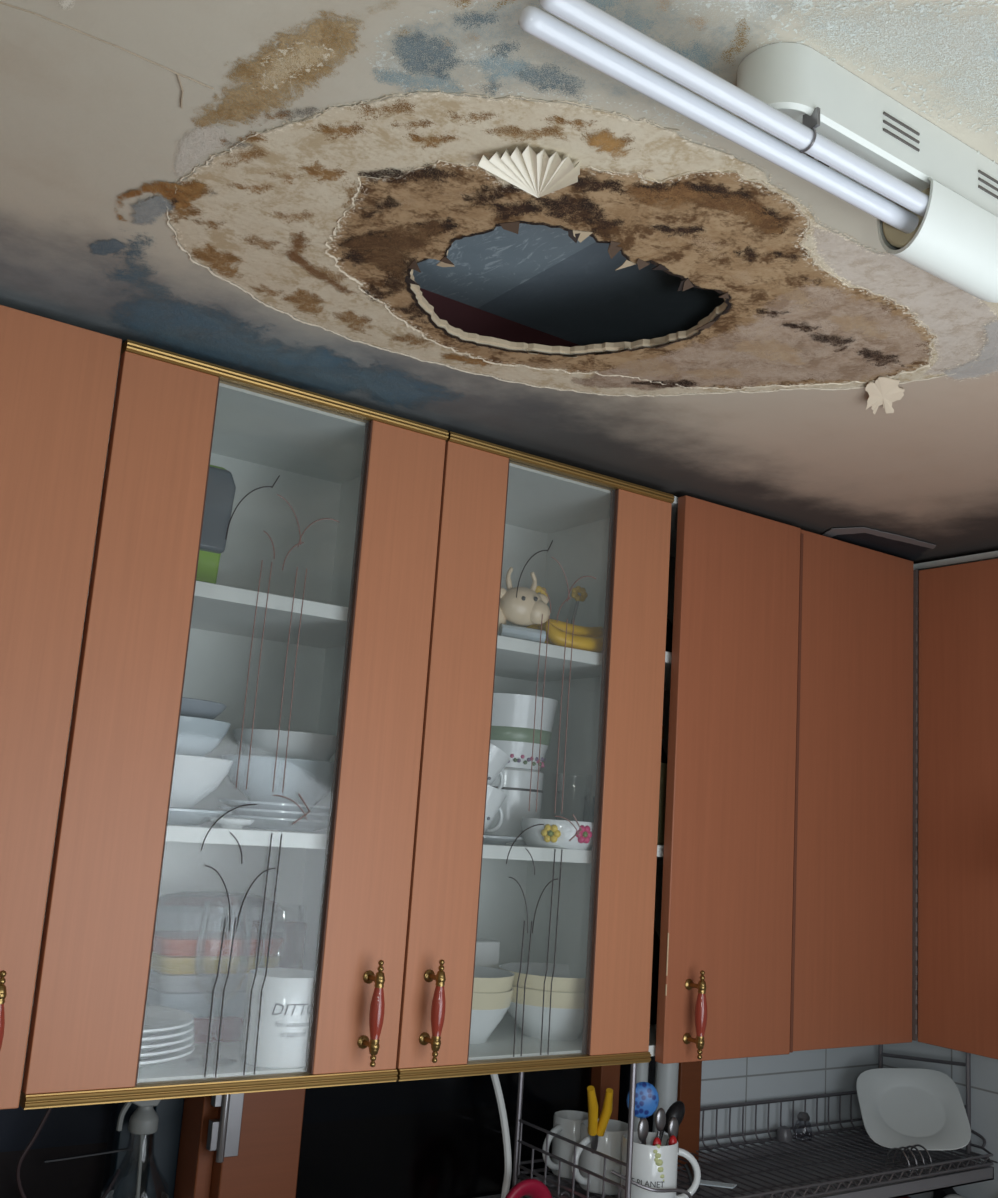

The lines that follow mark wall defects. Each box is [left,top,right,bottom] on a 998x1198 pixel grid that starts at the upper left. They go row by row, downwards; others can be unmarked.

water stain [191,0,736,138]
water stain [585,0,998,144]
peeling [164,88,998,414]
water stain [325,159,998,392]